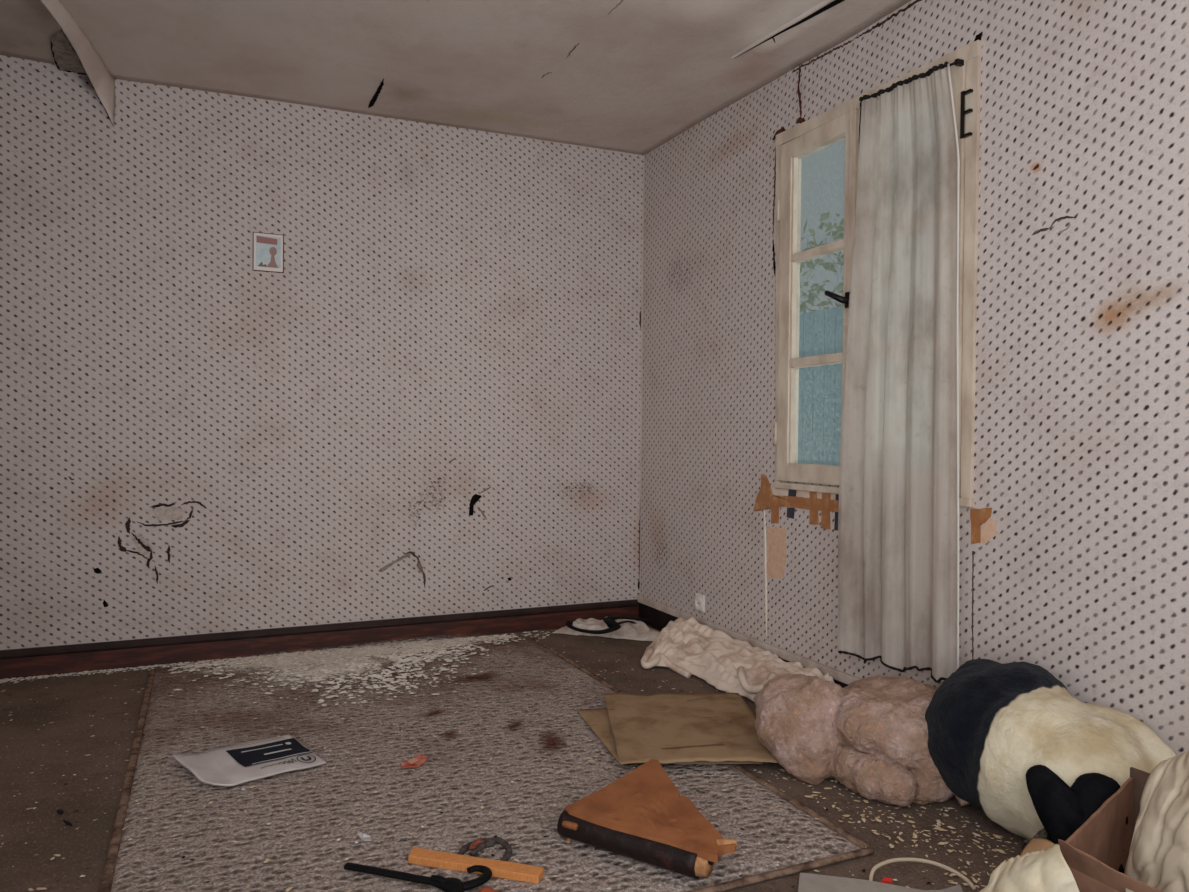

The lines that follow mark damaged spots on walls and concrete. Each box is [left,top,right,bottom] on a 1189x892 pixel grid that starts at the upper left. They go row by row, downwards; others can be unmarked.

crack [773,0,922,137]